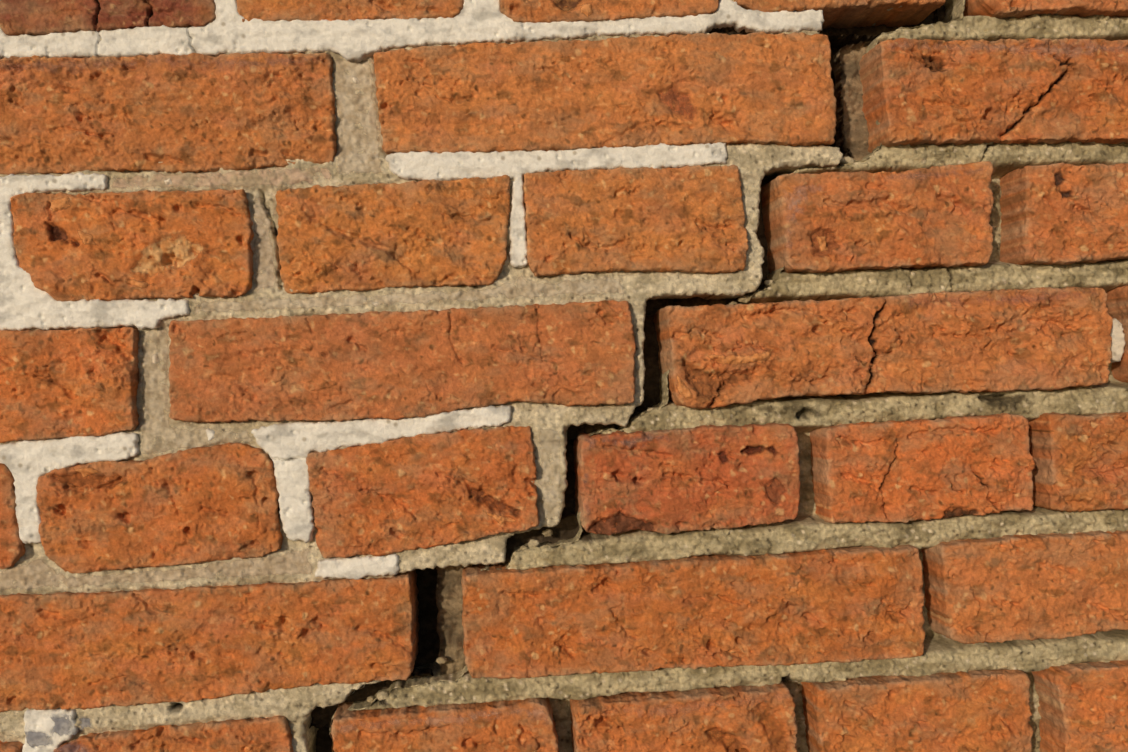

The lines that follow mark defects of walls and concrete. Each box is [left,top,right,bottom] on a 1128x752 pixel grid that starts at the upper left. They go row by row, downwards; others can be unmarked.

crack [820,5,946,165]
crack [984,59,1071,153]
crack [866,307,883,387]
crack [309,174,779,752]